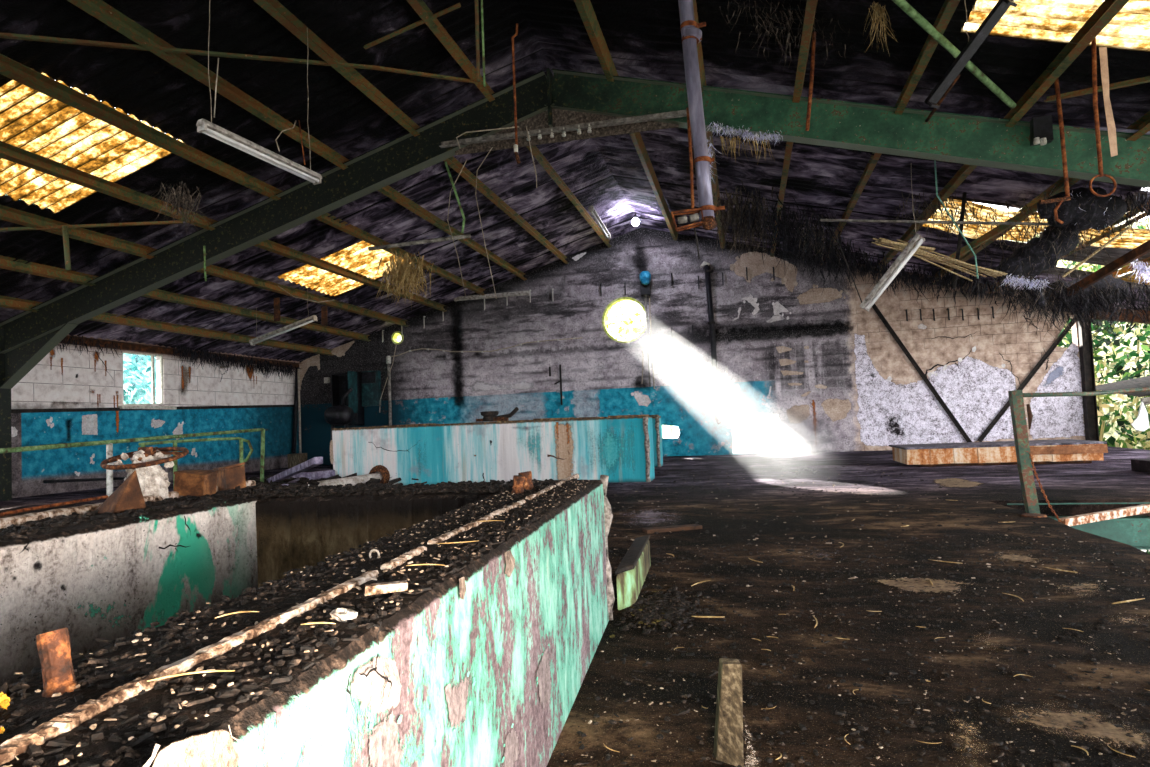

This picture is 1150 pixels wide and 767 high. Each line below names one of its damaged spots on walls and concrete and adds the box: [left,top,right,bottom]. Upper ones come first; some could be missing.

peeling [730,251,846,323]
peeling [776,346,851,424]
peeling [151,418,184,440]
spalling [504,550,515,577]
spalling [329,607,358,622]
peeling [445,672,476,733]
peeling [368,711,406,767]
peeling [502,723,519,767]